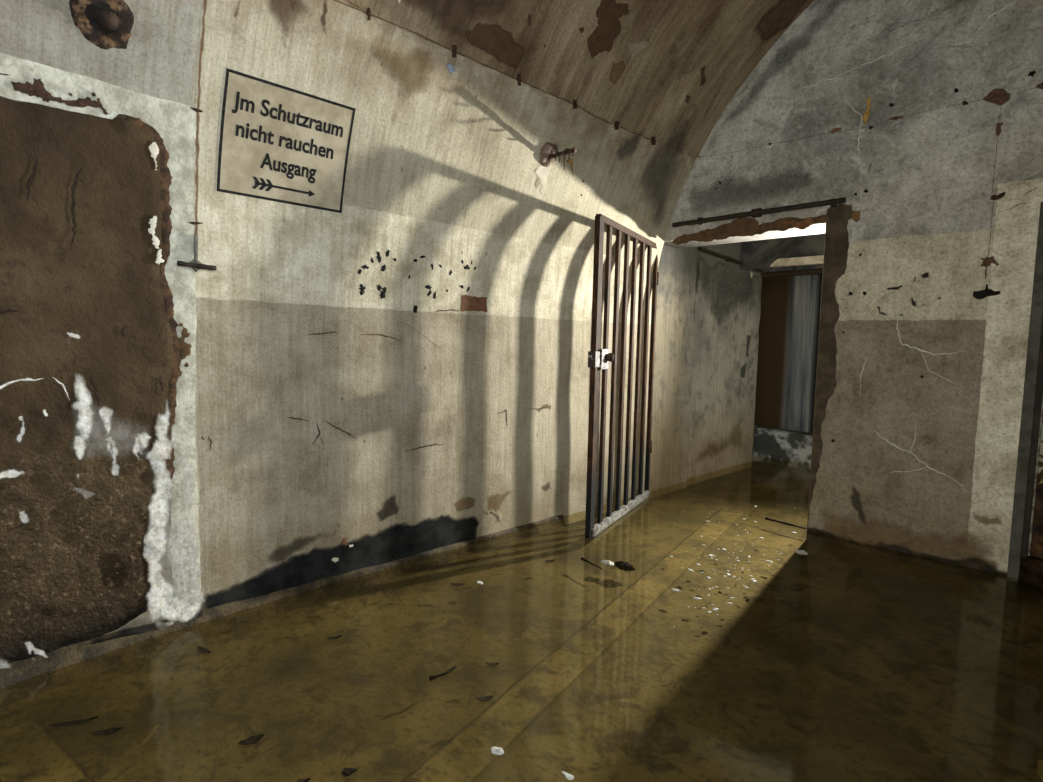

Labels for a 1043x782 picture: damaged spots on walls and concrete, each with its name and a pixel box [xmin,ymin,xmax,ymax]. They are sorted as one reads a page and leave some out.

peeling [465,23,525,68]
peeling [579,0,630,58]
spalling [0,73,192,665]
spalling [672,204,853,531]
crack [896,312,965,384]
water stain [0,469,23,478]
water stain [0,375,119,475]
water stain [91,408,479,644]
water stain [488,492,509,512]
crack [875,429,969,492]